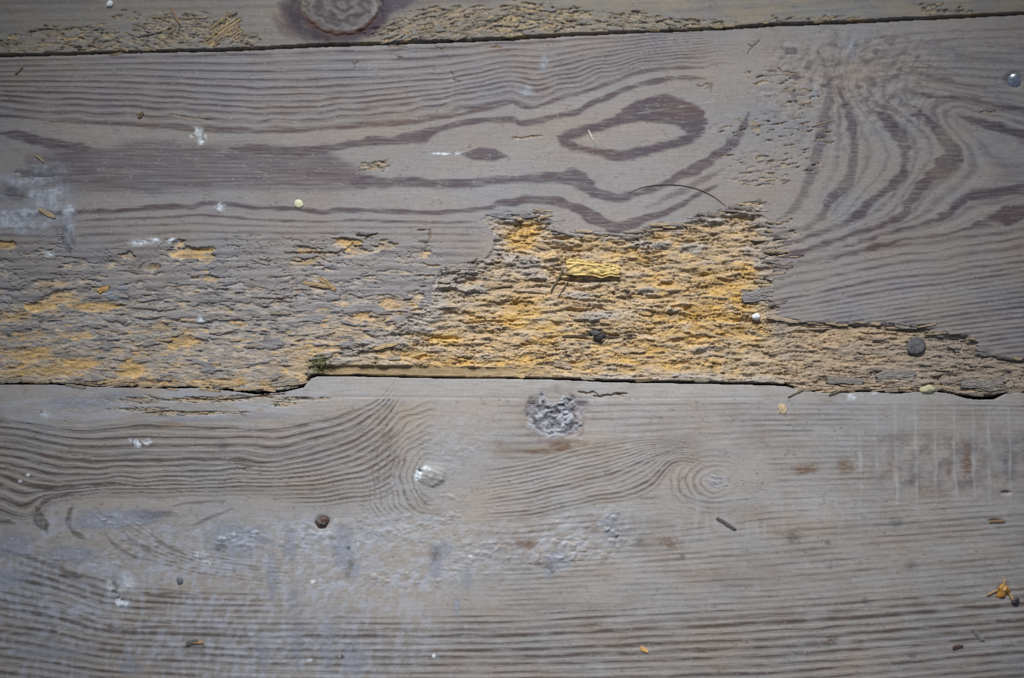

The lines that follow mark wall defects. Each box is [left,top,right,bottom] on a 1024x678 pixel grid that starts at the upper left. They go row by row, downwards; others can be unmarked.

peeling [0,10,261,56]
peeling [358,0,736,45]
peeling [719,119,834,186]
peeling [534,201,767,243]
peeling [438,263,477,283]
peeling [599,305,623,343]
peeling [741,219,1024,397]
peeling [372,340,402,360]